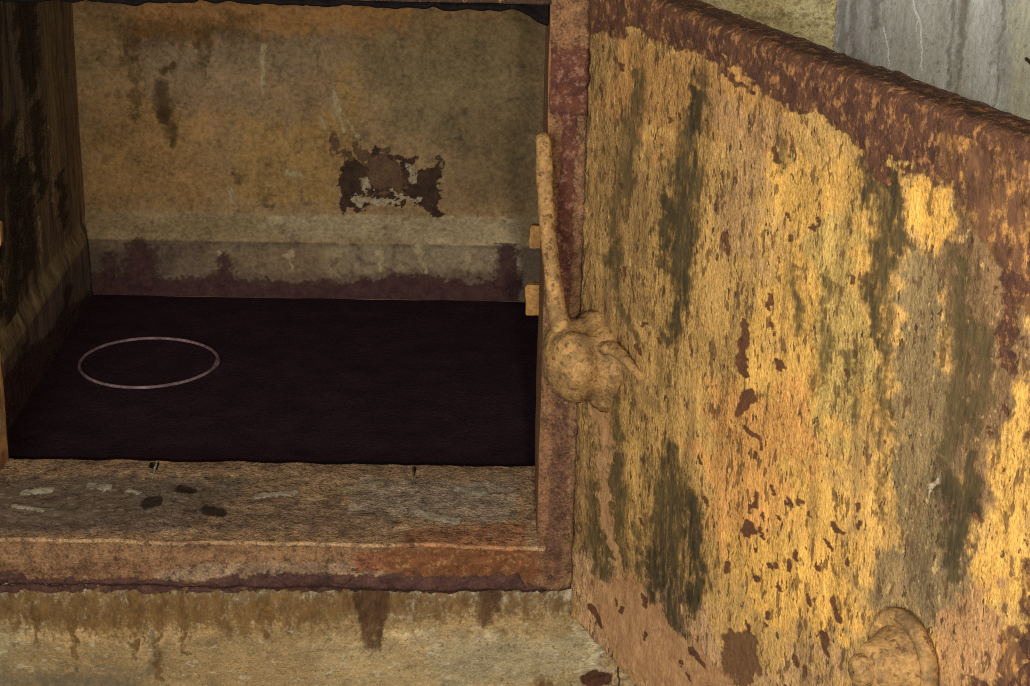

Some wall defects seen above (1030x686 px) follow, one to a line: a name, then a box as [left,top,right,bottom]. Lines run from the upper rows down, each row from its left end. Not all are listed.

leakage [0,2,68,326]
leakage [156,62,177,147]
peeling [329,133,445,217]
rust [550,43,591,314]
rust [589,0,1030,375]
rust [0,548,571,682]
rust [960,558,1030,686]